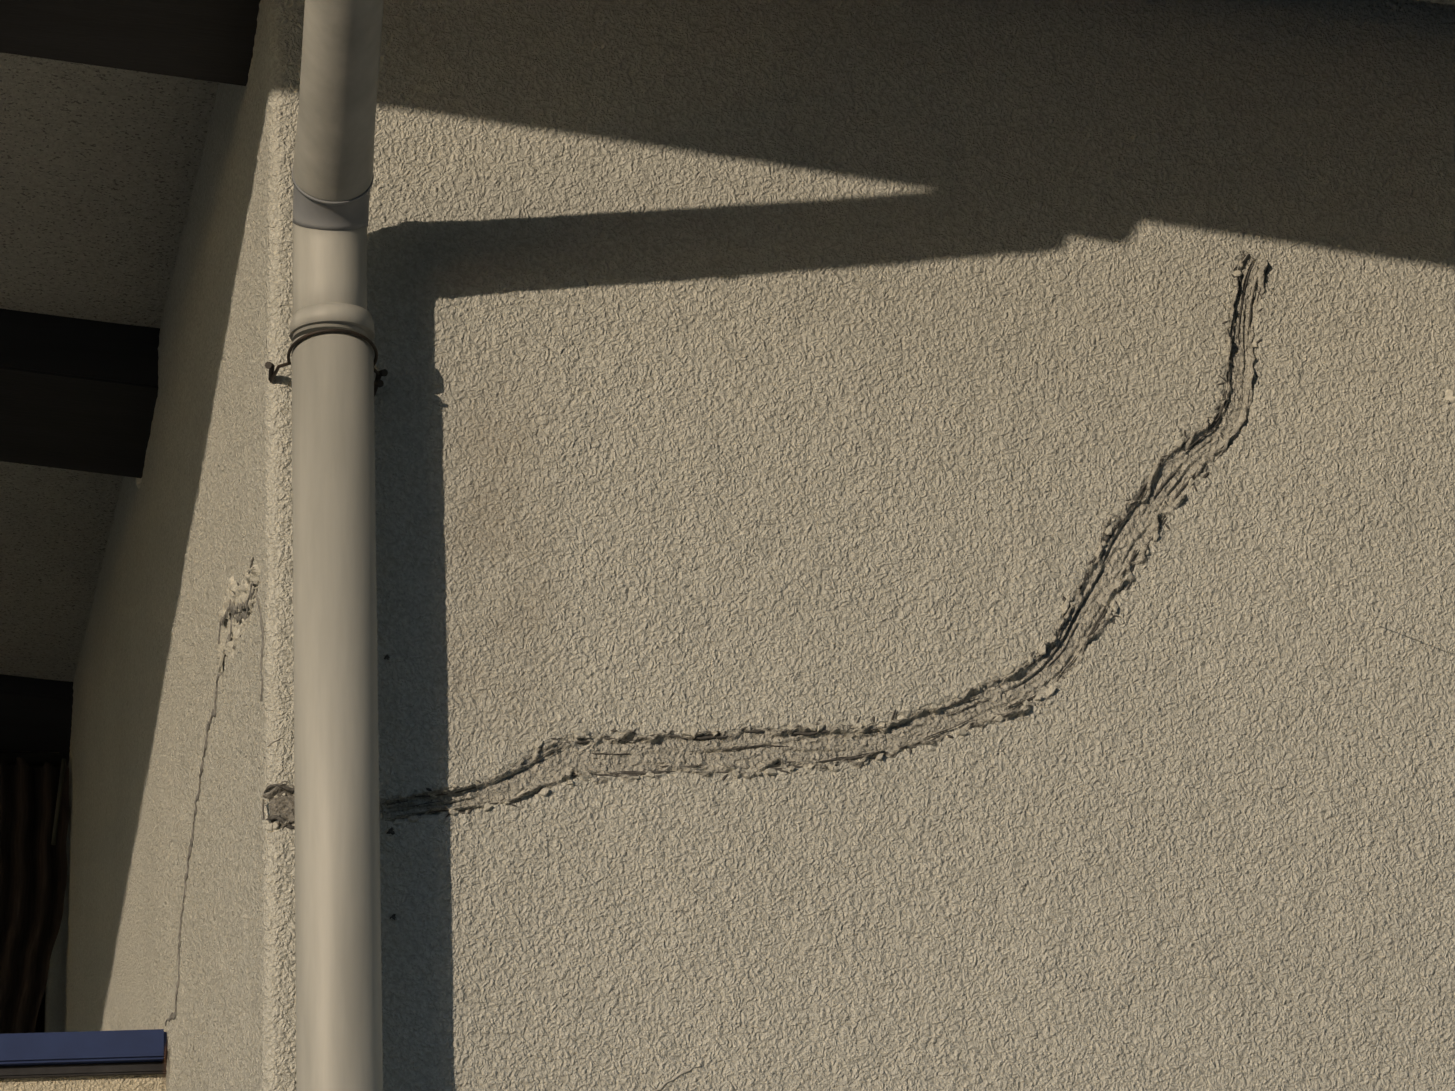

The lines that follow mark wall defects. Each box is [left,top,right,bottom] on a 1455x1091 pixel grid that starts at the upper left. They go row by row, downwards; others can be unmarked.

crack [165,557,264,1026]
crack [382,250,1268,825]